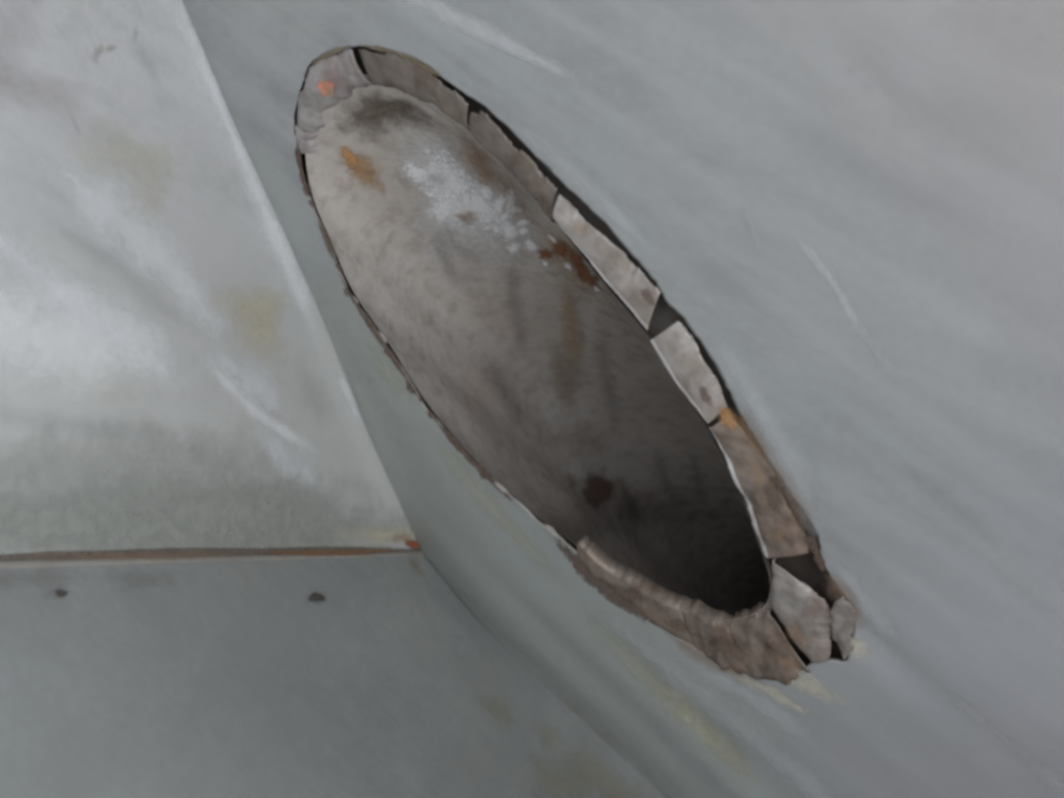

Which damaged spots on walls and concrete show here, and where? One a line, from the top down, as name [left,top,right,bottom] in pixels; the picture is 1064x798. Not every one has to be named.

corrosion [341,147,373,183]
peeling [401,134,540,269]
corrosion [535,234,601,293]